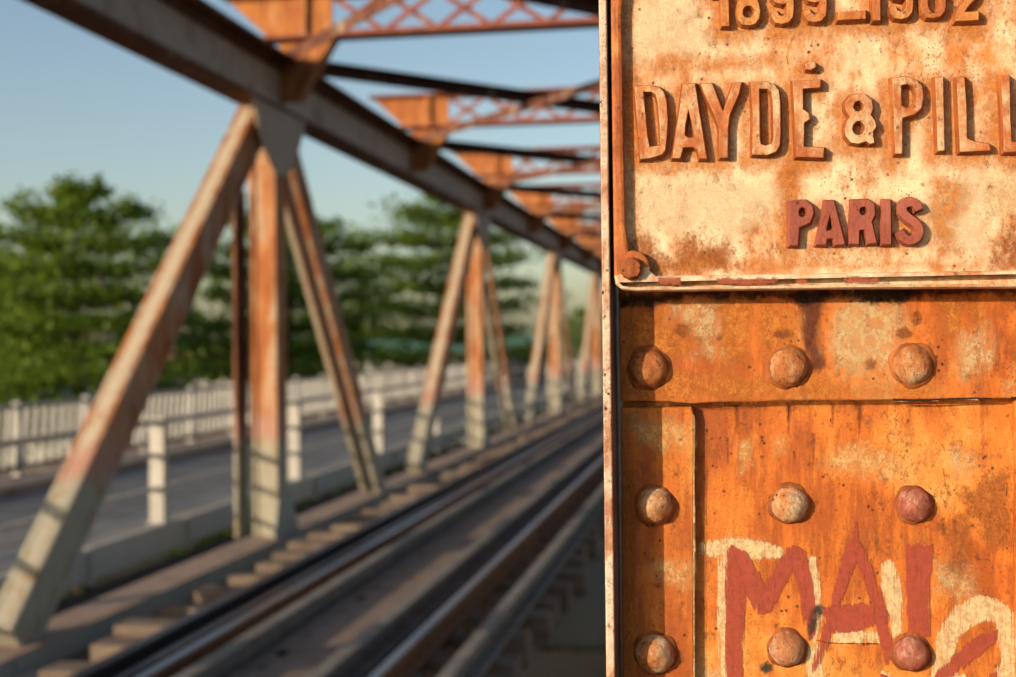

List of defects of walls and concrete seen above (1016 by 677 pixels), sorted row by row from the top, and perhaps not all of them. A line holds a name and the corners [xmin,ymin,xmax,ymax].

corrosion [653,0,978,72]
corrosion [624,5,916,286]
corrosion [902,72,1016,167]
corrosion [932,179,965,254]
corrosion [992,226,1016,269]